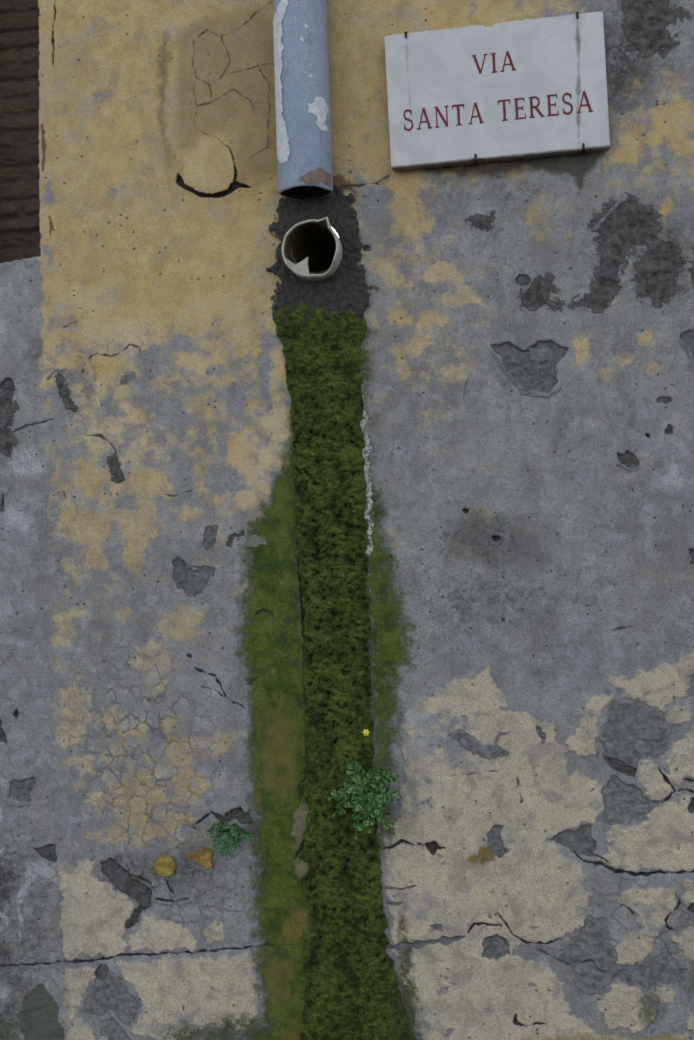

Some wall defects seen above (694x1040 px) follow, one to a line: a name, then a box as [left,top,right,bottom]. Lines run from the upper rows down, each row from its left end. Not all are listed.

crack [49,1,57,67]
flaking render [621,0,691,59]
crack [176,150,261,198]
flaking render [515,192,694,314]
water stain [360,390,374,558]
water stain [255,701,299,809]
flaking render [599,697,672,825]
flaking render [101,858,189,929]
crack [573,850,694,931]
crack [0,944,299,977]
crack [387,936,465,952]
flaking render [467,913,687,995]